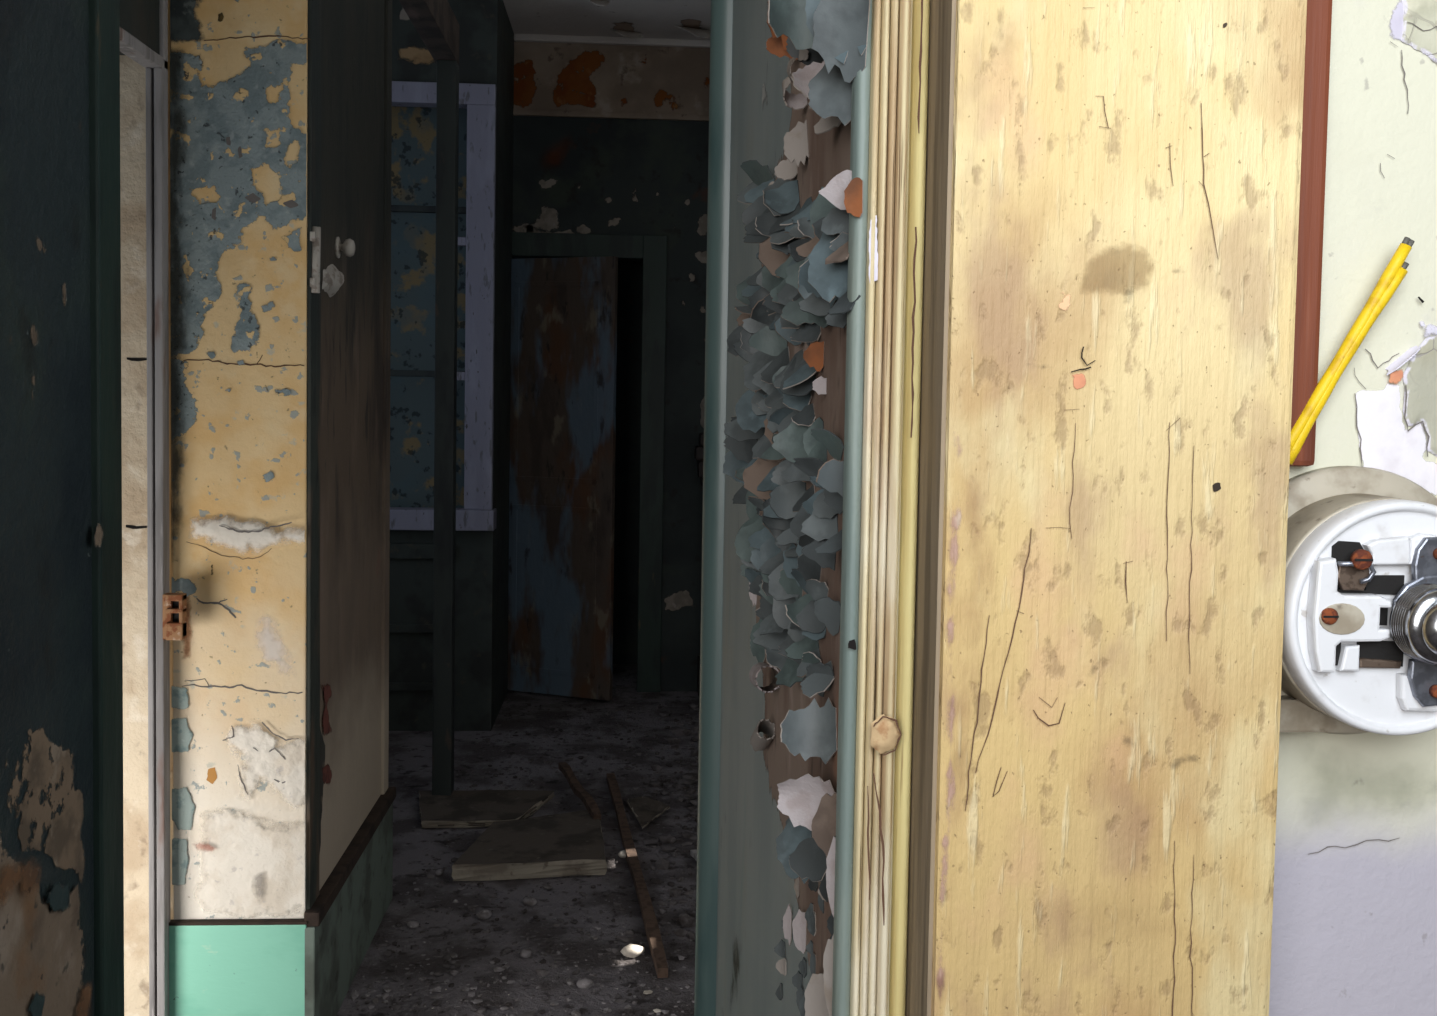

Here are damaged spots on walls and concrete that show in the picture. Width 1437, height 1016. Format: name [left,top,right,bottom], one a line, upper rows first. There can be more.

peeling [1390,0,1437,64]
crack [1390,41,1409,114]
peeling [170,39,307,437]
crack [127,355,147,363]
crack [183,355,304,367]
crack [1354,349,1399,389]
spalling [1355,321,1437,495]
peeling [723,0,878,1016]
rust [183,597,191,656]
crack [182,678,302,694]
spalling [171,684,332,919]
peeling [0,728,91,1016]